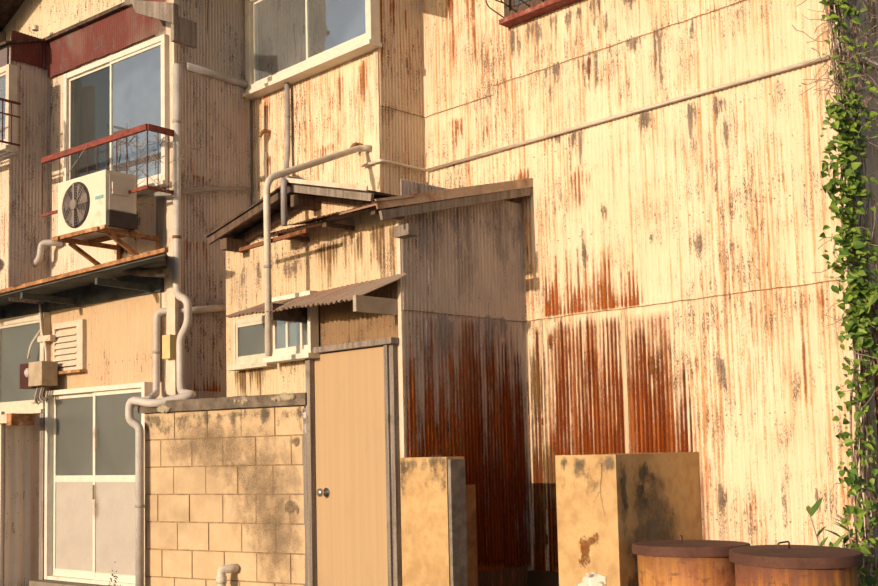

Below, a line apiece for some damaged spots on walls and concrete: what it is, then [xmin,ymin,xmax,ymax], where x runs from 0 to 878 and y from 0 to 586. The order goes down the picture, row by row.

damp [145,416,186,434]
damp [181,412,245,455]
rust [407,249,693,572]
damp [241,454,276,508]
damp [605,457,674,543]